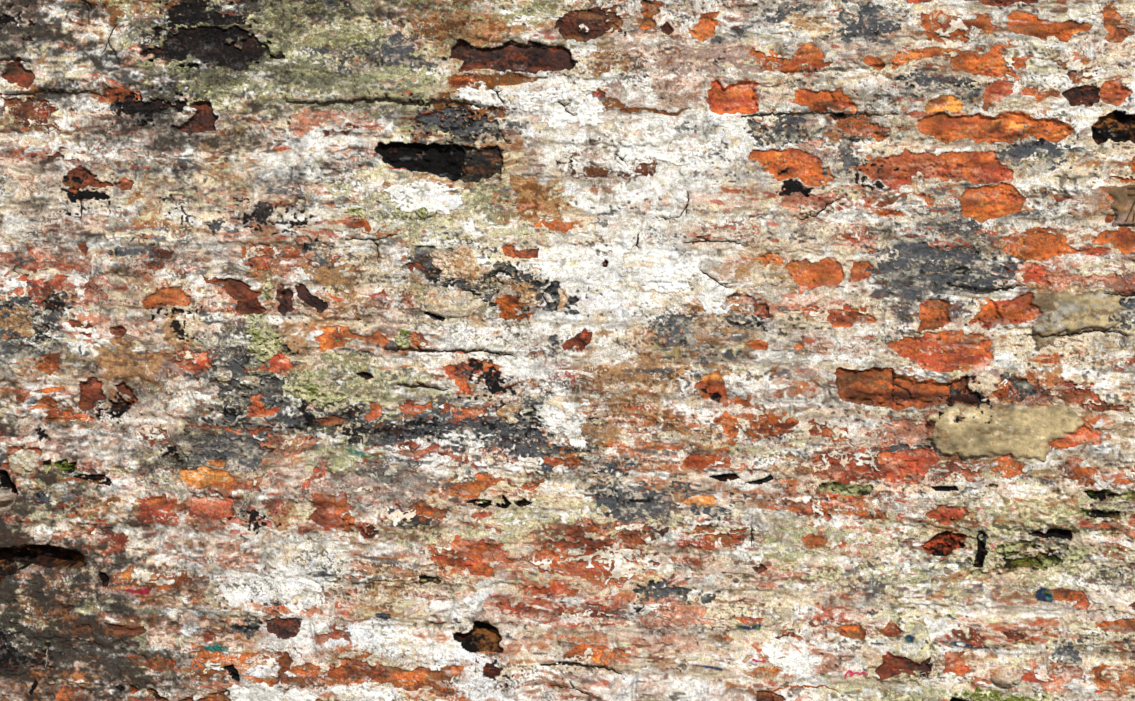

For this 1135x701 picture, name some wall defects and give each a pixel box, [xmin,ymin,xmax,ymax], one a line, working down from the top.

leakage [308,31,448,83]
spalling [442,5,626,74]
spalling [639,0,674,35]
spalling [374,142,504,182]
flaking render [681,0,1135,571]
leakage [860,212,1017,309]
peeling [678,453,773,485]
spalling [0,446,195,591]
peeling [146,392,678,667]
flaking render [115,615,464,701]
flaking render [775,617,902,641]
spalling [875,624,986,680]